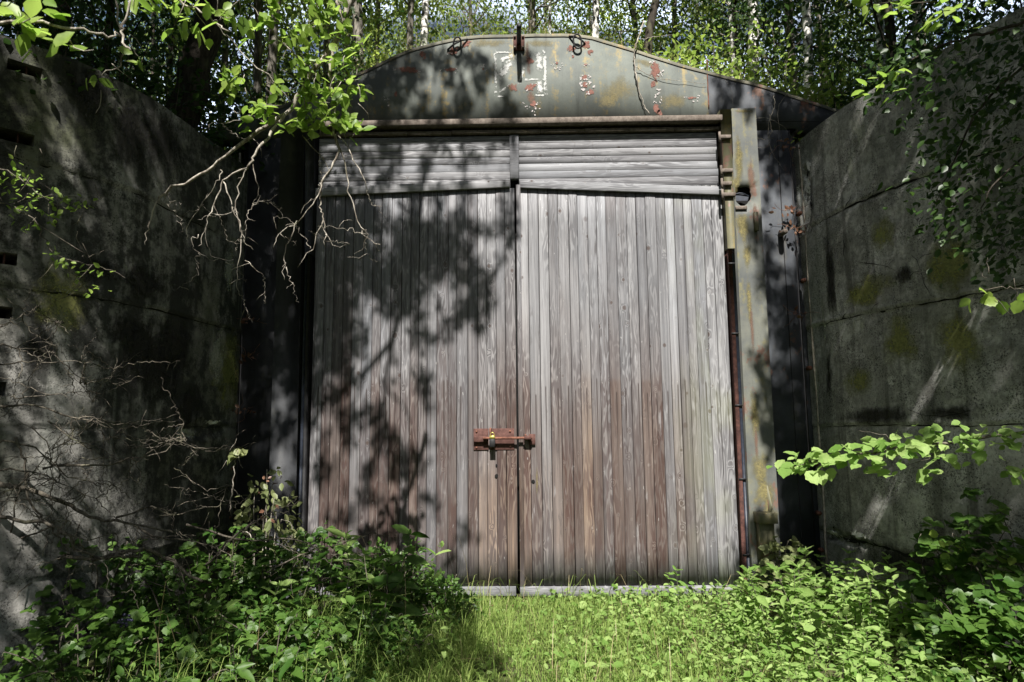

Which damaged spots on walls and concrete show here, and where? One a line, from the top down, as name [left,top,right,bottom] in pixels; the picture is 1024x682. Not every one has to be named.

peeling [551,41,595,95]
peeling [649,61,664,115]
crack [811,142,1020,231]
crack [0,284,237,336]
leakage [896,266,911,282]
crack [819,241,1024,326]